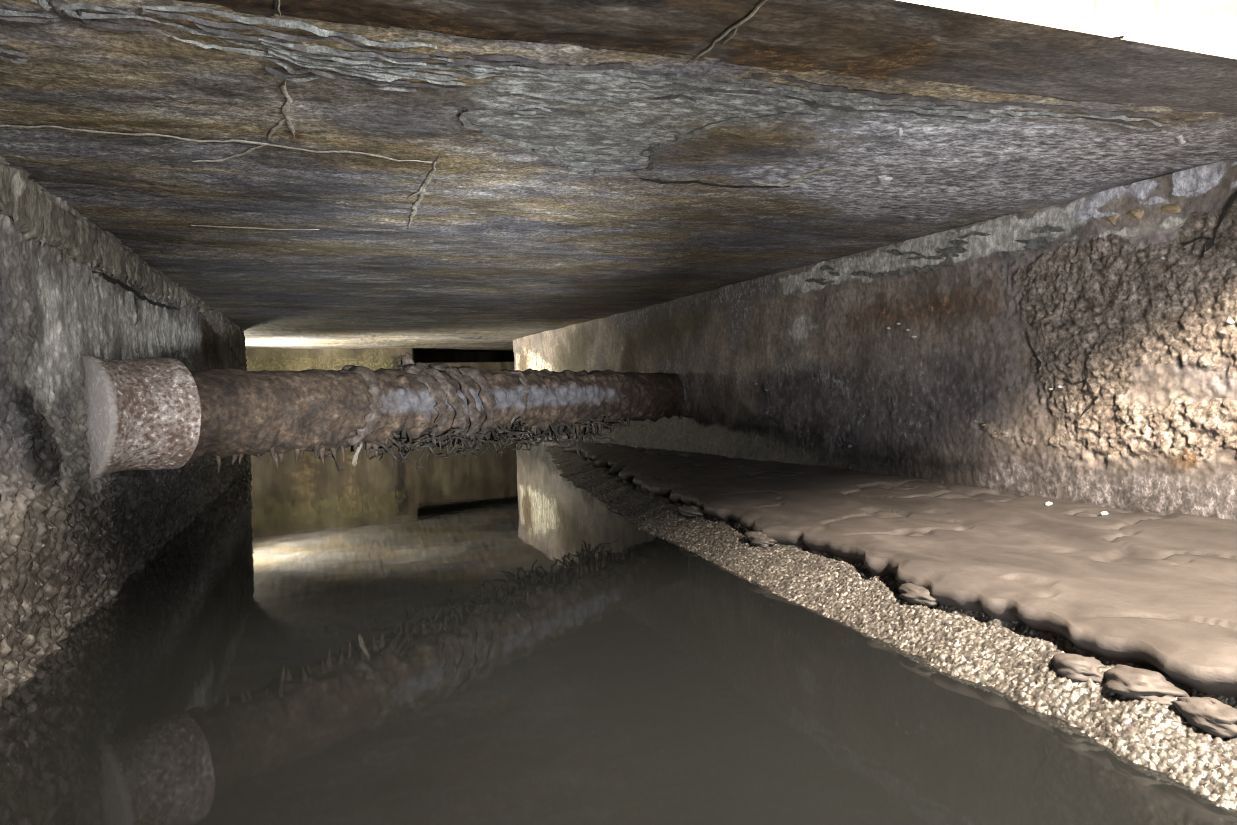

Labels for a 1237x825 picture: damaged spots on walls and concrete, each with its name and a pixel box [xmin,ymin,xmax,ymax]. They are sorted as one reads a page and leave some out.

crack [273,0,281,17]
crack [693,0,767,62]
crack [1182,191,1237,262]
spalling [613,161,1237,465]